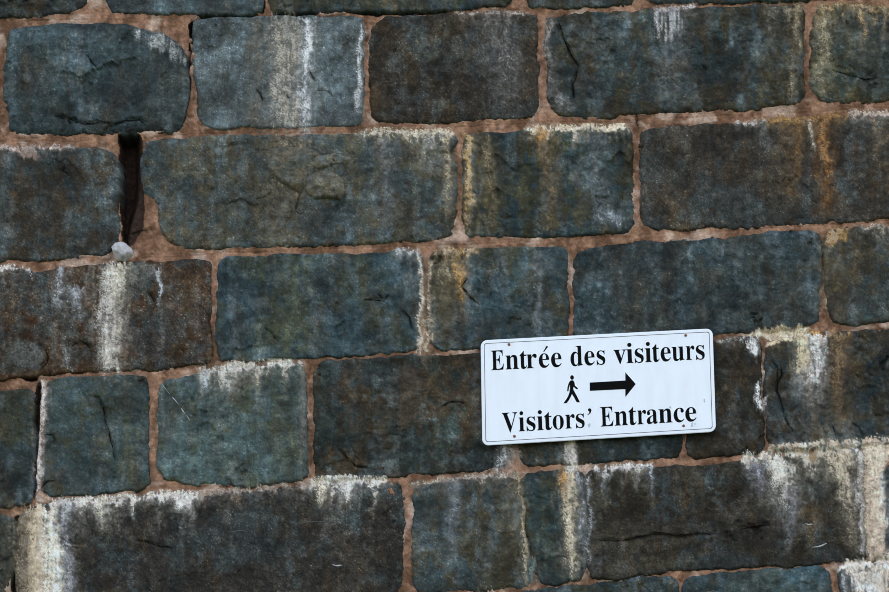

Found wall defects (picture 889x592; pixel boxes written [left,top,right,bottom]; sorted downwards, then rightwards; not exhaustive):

leakage [270,11,313,148]
leakage [53,265,84,309]
leakage [94,257,131,374]
leakage [198,358,303,388]
leakage [719,324,828,391]
leakage [36,380,48,491]
leakage [17,474,387,592]
leakage [741,436,889,592]